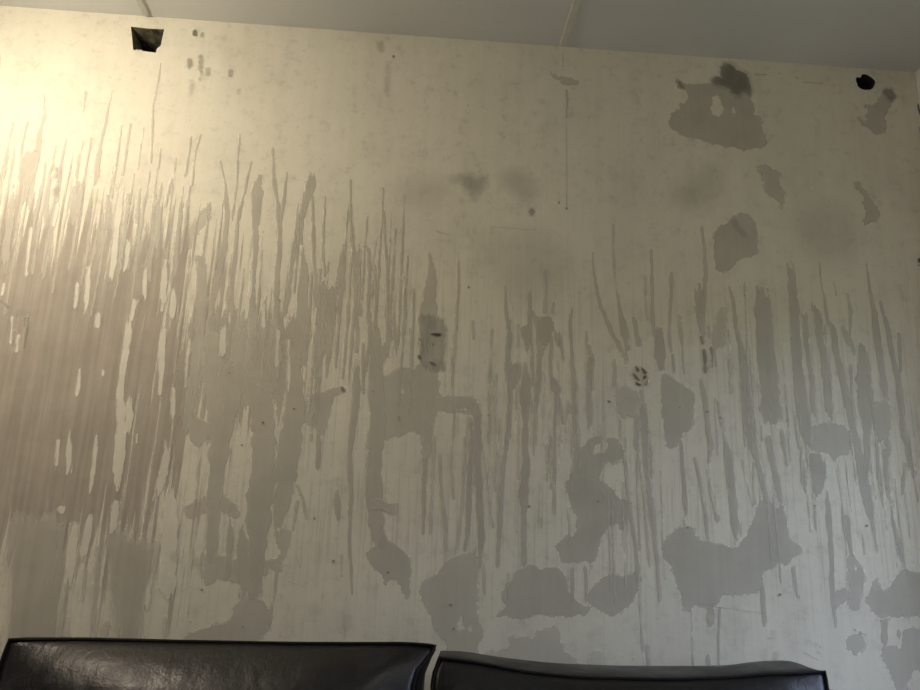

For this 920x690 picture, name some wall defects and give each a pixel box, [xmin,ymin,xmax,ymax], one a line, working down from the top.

peeling [668,63,767,151]
peeling [858,88,895,134]
peeling [713,212,759,273]
peeling [293,386,345,470]
peeling [366,327,641,664]
peeling [654,327,802,666]
peeling [810,422,920,690]
peeling [184,597,272,641]